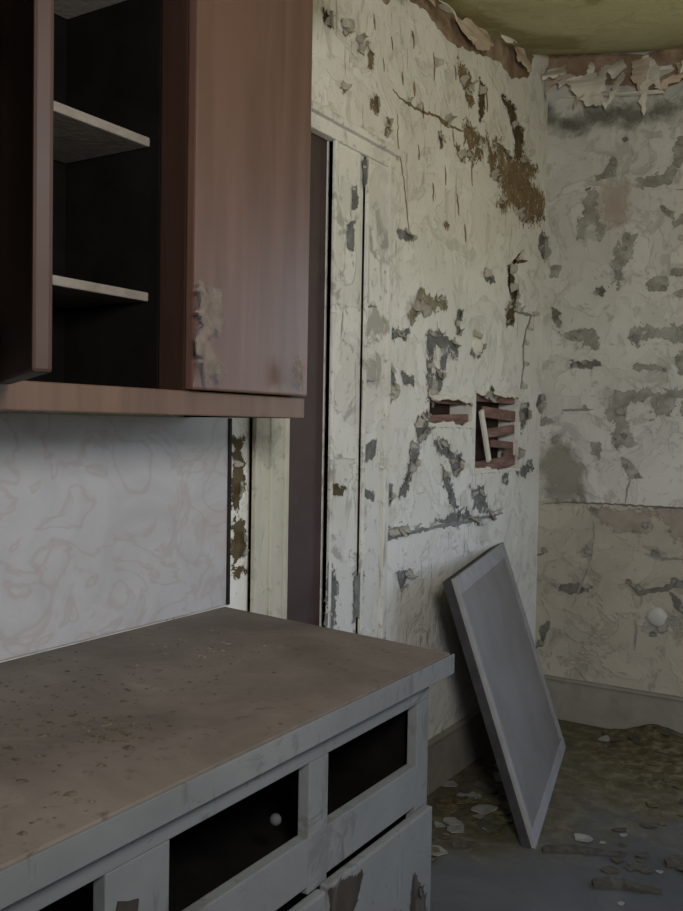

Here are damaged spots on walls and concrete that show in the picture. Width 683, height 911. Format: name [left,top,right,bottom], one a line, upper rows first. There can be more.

peeling [323,6,385,72]
peeling [370,92,394,137]
peeling [347,159,367,252]
crack [393,89,465,237]
peeling [433,52,562,278]
peeling [505,265,521,328]
peeling [551,307,601,369]
peeling [627,322,683,375]
spalling [388,287,553,541]
peeling [231,435,249,580]
peeling [551,386,683,608]
crack [625,549,683,596]